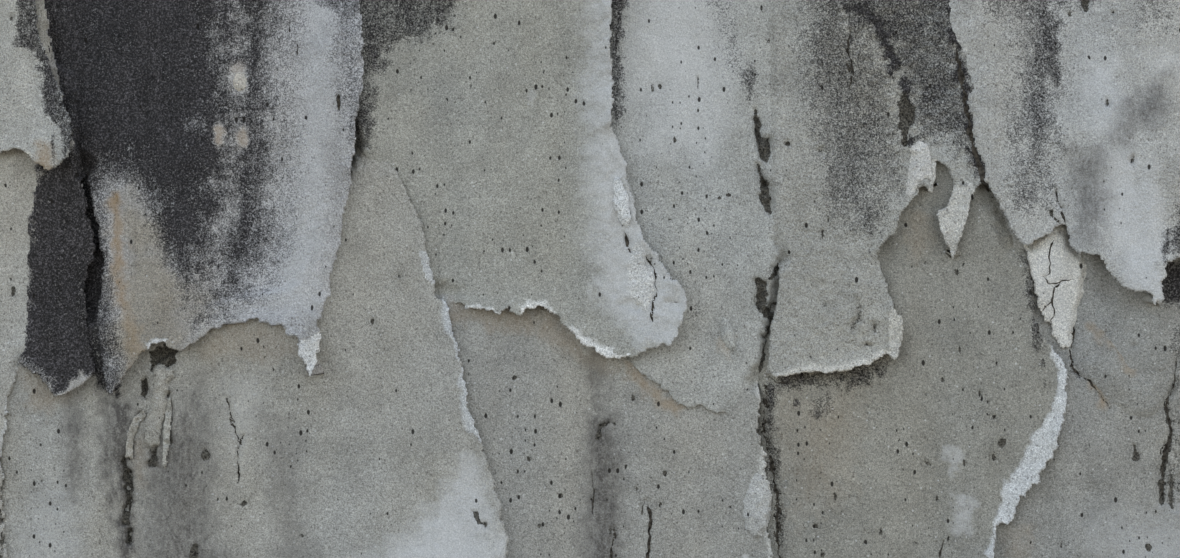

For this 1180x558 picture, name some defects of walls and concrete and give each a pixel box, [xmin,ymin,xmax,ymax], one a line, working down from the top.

peeling [0,0,73,558]
peeling [70,237,242,558]
leakage [3,0,509,558]
peeling [271,0,1099,558]
crack [760,377,786,558]
leakage [554,0,1180,558]
peeling [1067,0,1124,43]
spalling [1130,443,1142,463]
peeling [1128,103,1180,190]